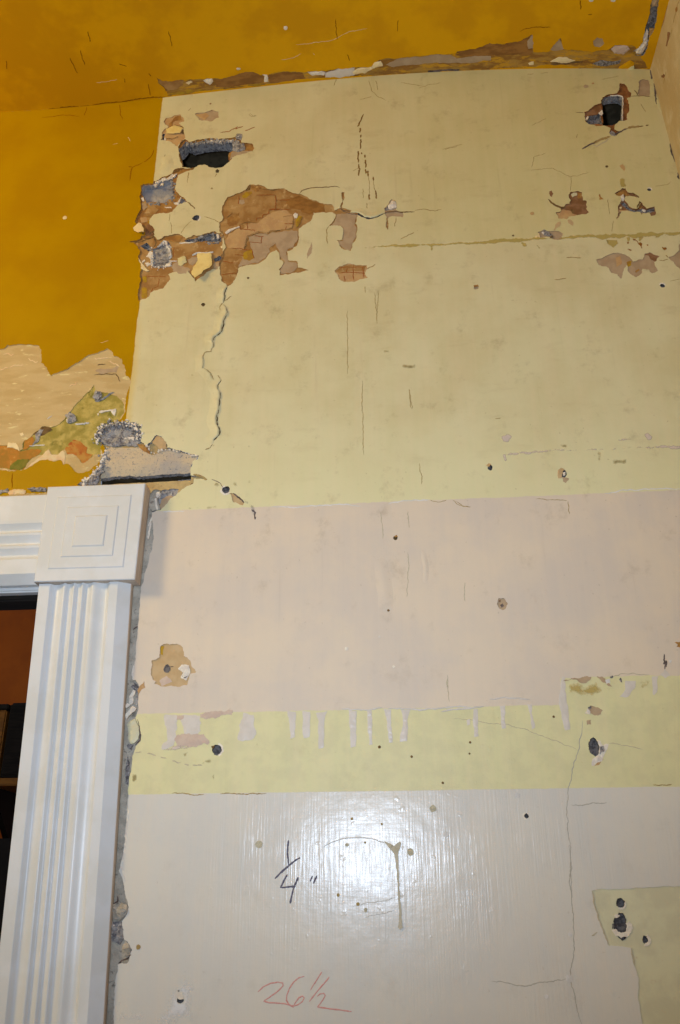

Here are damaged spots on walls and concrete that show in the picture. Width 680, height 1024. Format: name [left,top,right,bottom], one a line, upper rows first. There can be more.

peeling [129,35,666,301]
crack [342,207,441,219]
peeling [597,244,680,287]
crack [195,285,231,450]
peeling [0,344,256,526]
peeling [125,644,196,744]
peeling [585,706,603,725]
peeling [564,673,646,687]
spalling [211,743,224,756]
crack [459,718,607,1024]
spalling [612,898,651,946]